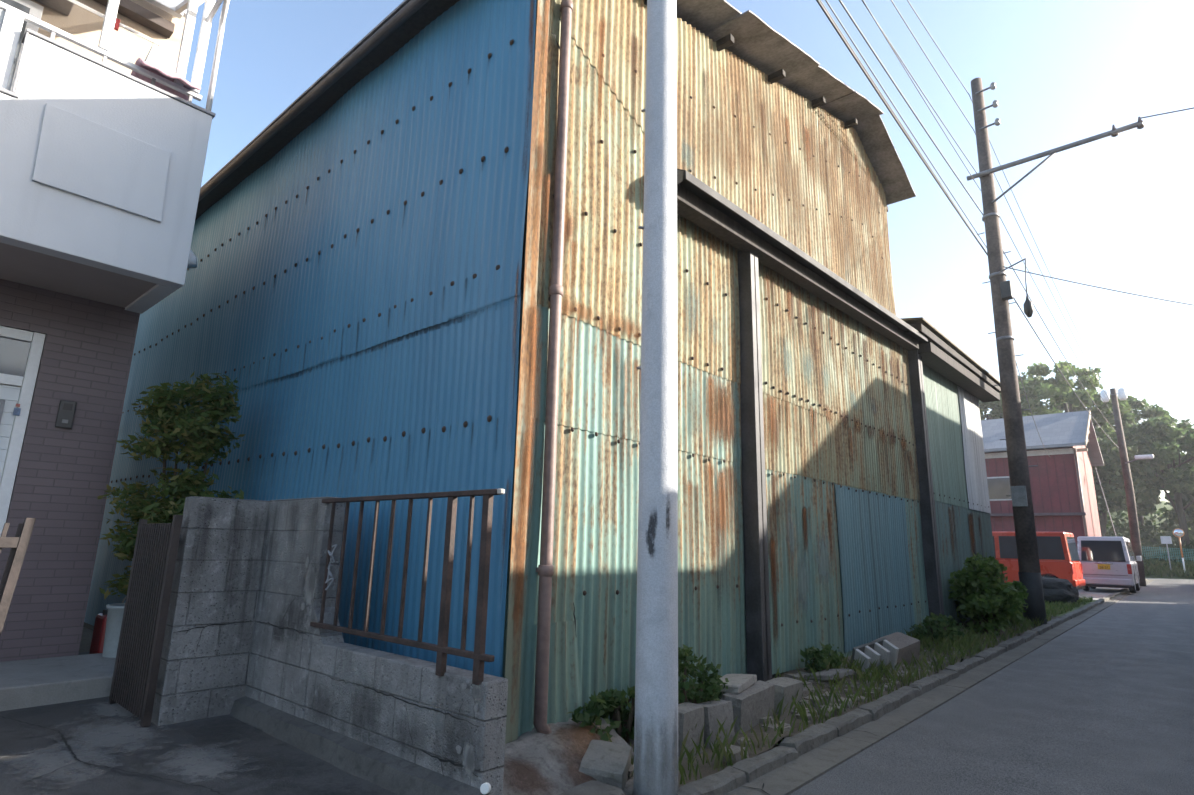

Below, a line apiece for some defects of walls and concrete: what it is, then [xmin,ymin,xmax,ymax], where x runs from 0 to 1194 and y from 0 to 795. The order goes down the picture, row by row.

rust [529,0,549,86]
rust [538,148,550,222]
rust [563,211,577,280]
rust [563,299,641,422]
rust [765,272,906,409]
rust [503,310,537,610]
rust [708,376,734,448]
rust [763,397,913,472]
rust [688,464,735,562]
rust [795,507,810,547]